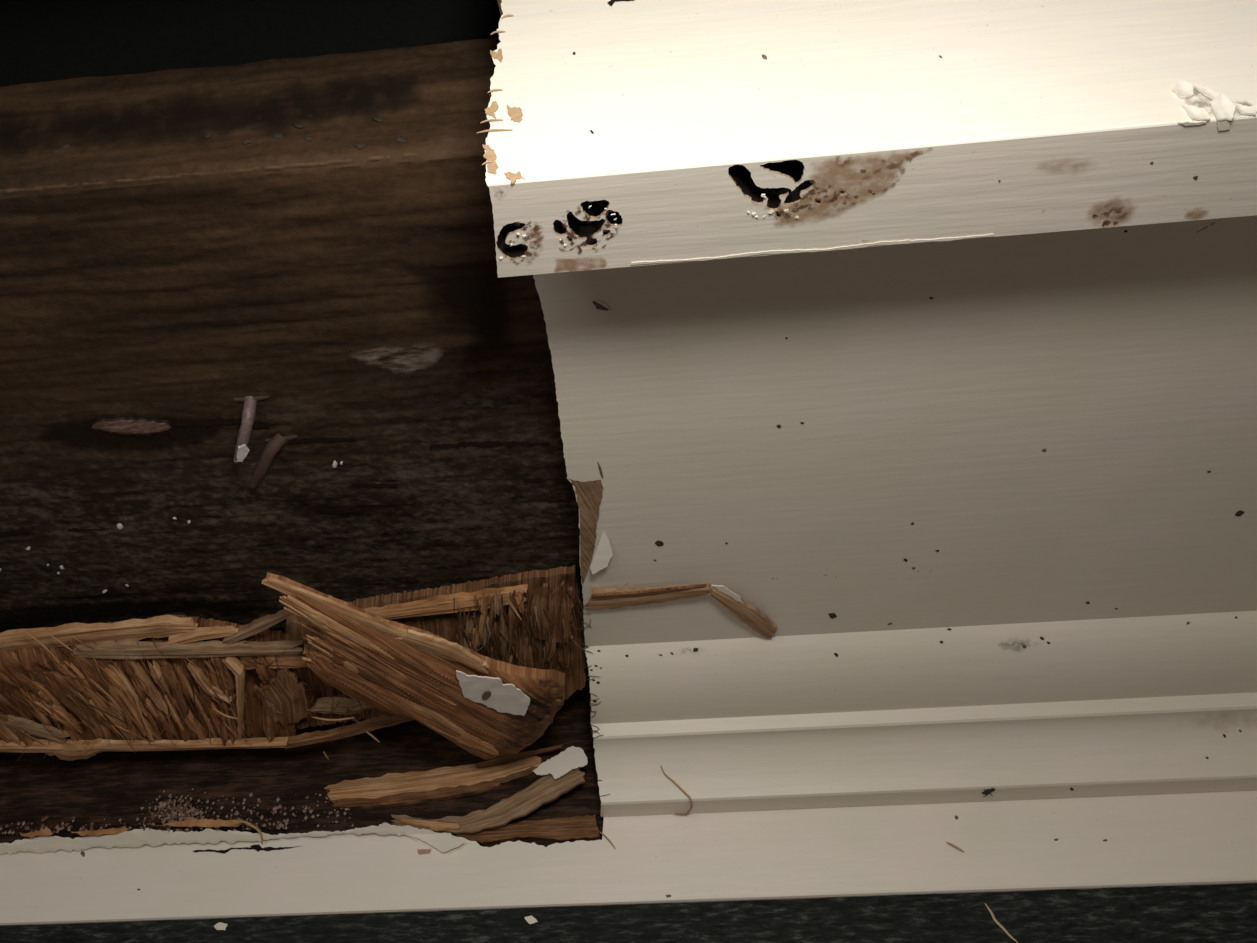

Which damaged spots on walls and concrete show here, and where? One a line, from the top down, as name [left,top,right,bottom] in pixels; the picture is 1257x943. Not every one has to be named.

water stain [875,148,931,191]
water stain [509,222,542,264]
water stain [560,207,617,253]
peeling [568,462,613,584]
peeling [456,670,530,716]
peeling [0,746,588,855]